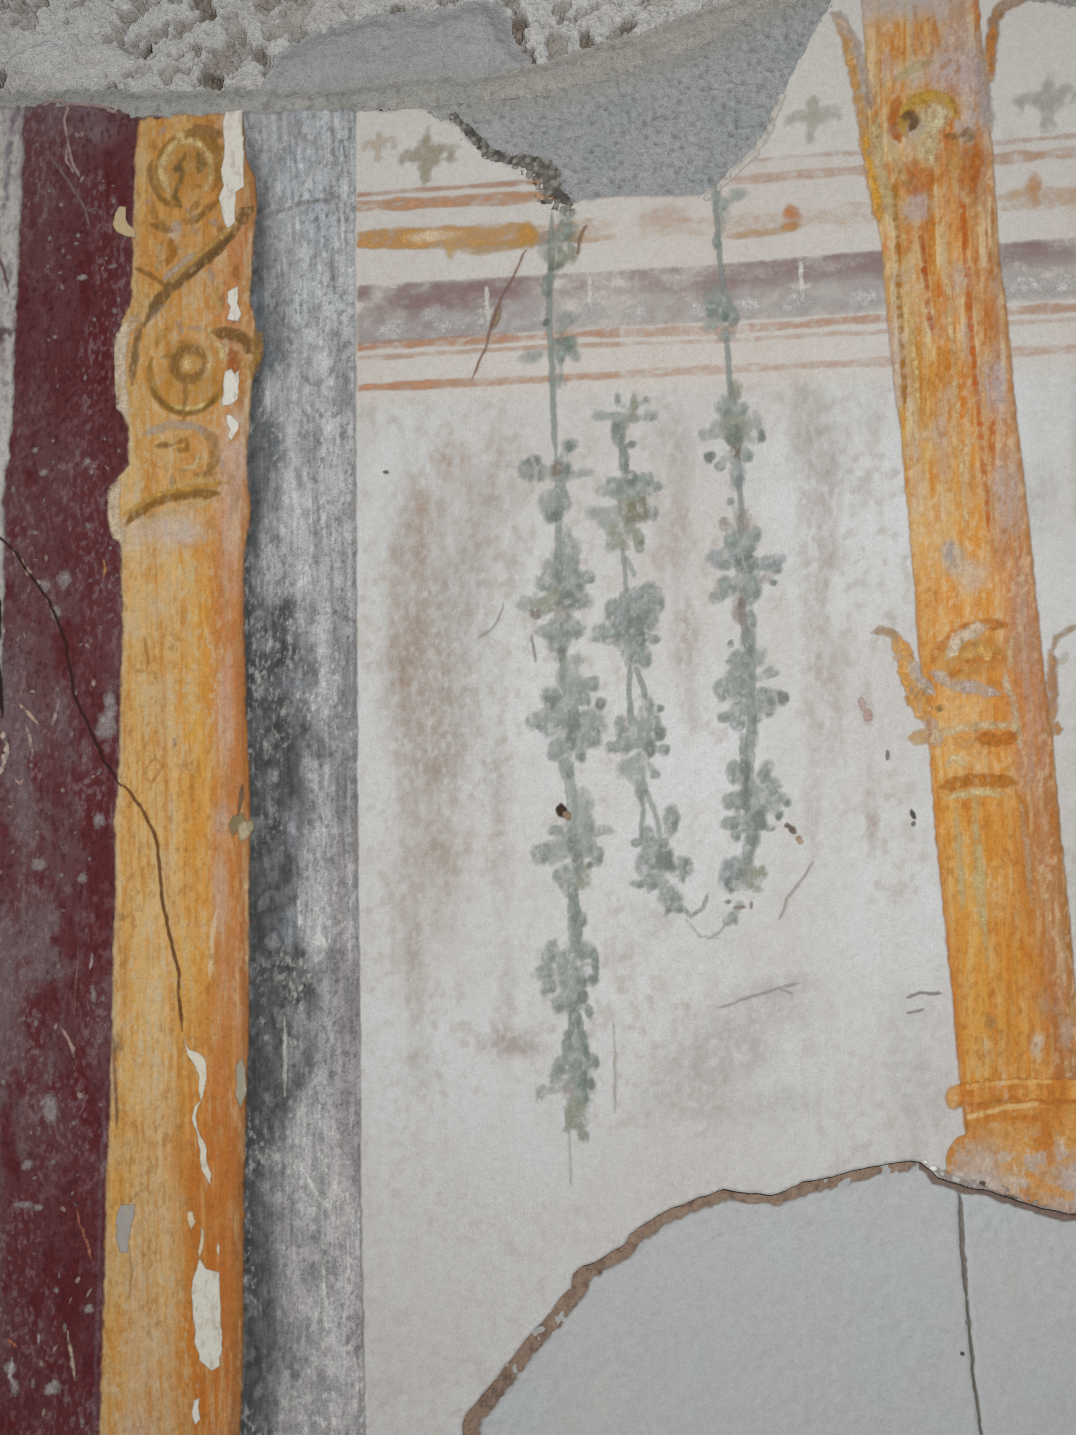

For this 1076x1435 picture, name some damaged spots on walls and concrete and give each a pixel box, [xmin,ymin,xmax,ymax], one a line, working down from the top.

peeling [113,206,136,238]
peeling [219,110,244,228]
spalling [420,0,834,217]
peeling [227,287,241,321]
crack [474,252,525,375]
peeling [222,369,239,440]
crack [0,537,183,1027]
peeling [184,1039,211,1185]
peeling [236,1059,247,1106]
peeling [187,1211,222,1370]
crack [463,1160,1076,1435]
peeling [192,1399,200,1424]